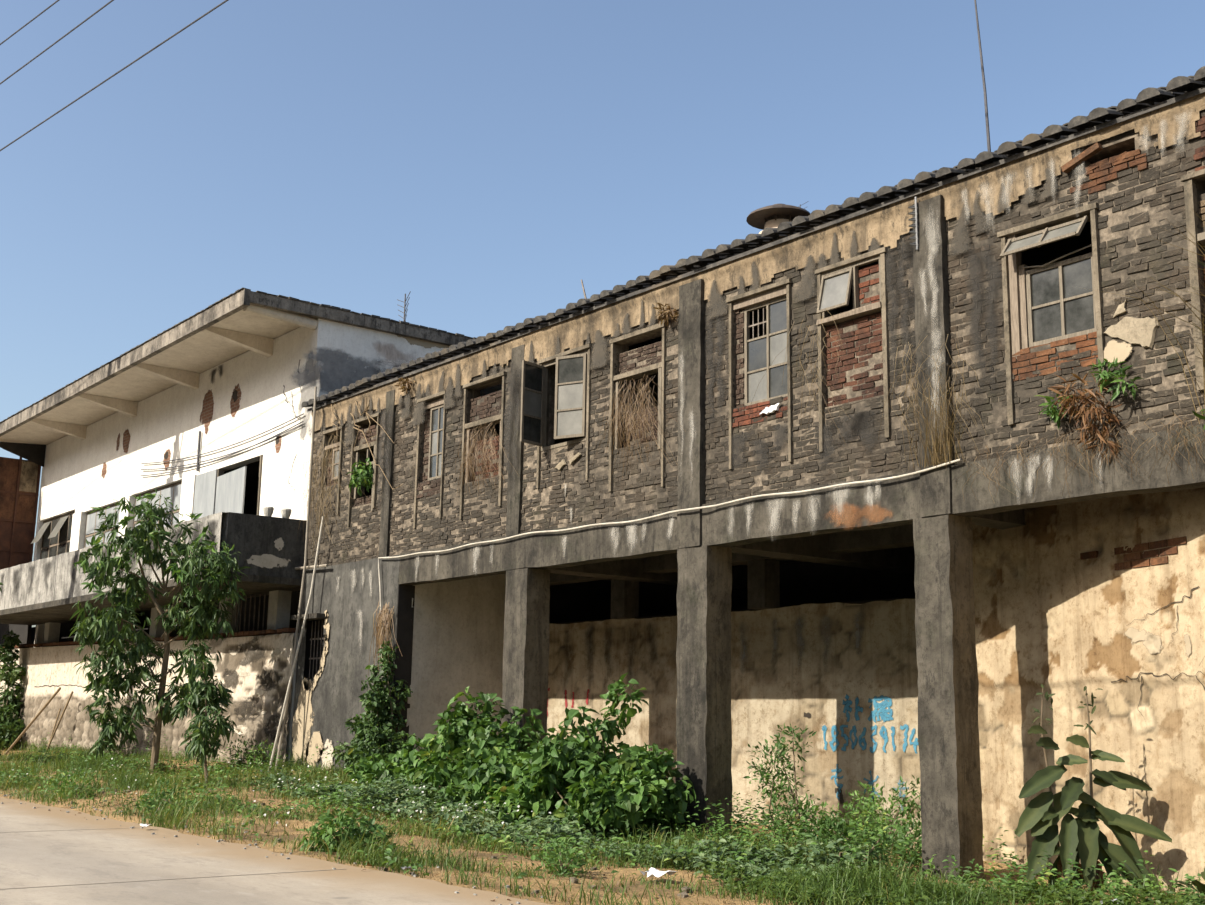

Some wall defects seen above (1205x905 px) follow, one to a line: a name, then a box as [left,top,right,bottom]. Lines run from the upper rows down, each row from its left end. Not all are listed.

spalling [1061,142,1148,194]
damp [795,183,1006,376]
damp [705,262,760,411]
flaking render [200,390,214,434]
flaking render [230,383,241,417]
damp [292,349,461,502]
flaking render [1114,536,1187,570]
crack [1126,586,1199,634]
mould [222,637,282,691]
flaking render [292,610,334,770]
crack [1111,671,1205,712]
mould [234,697,286,742]